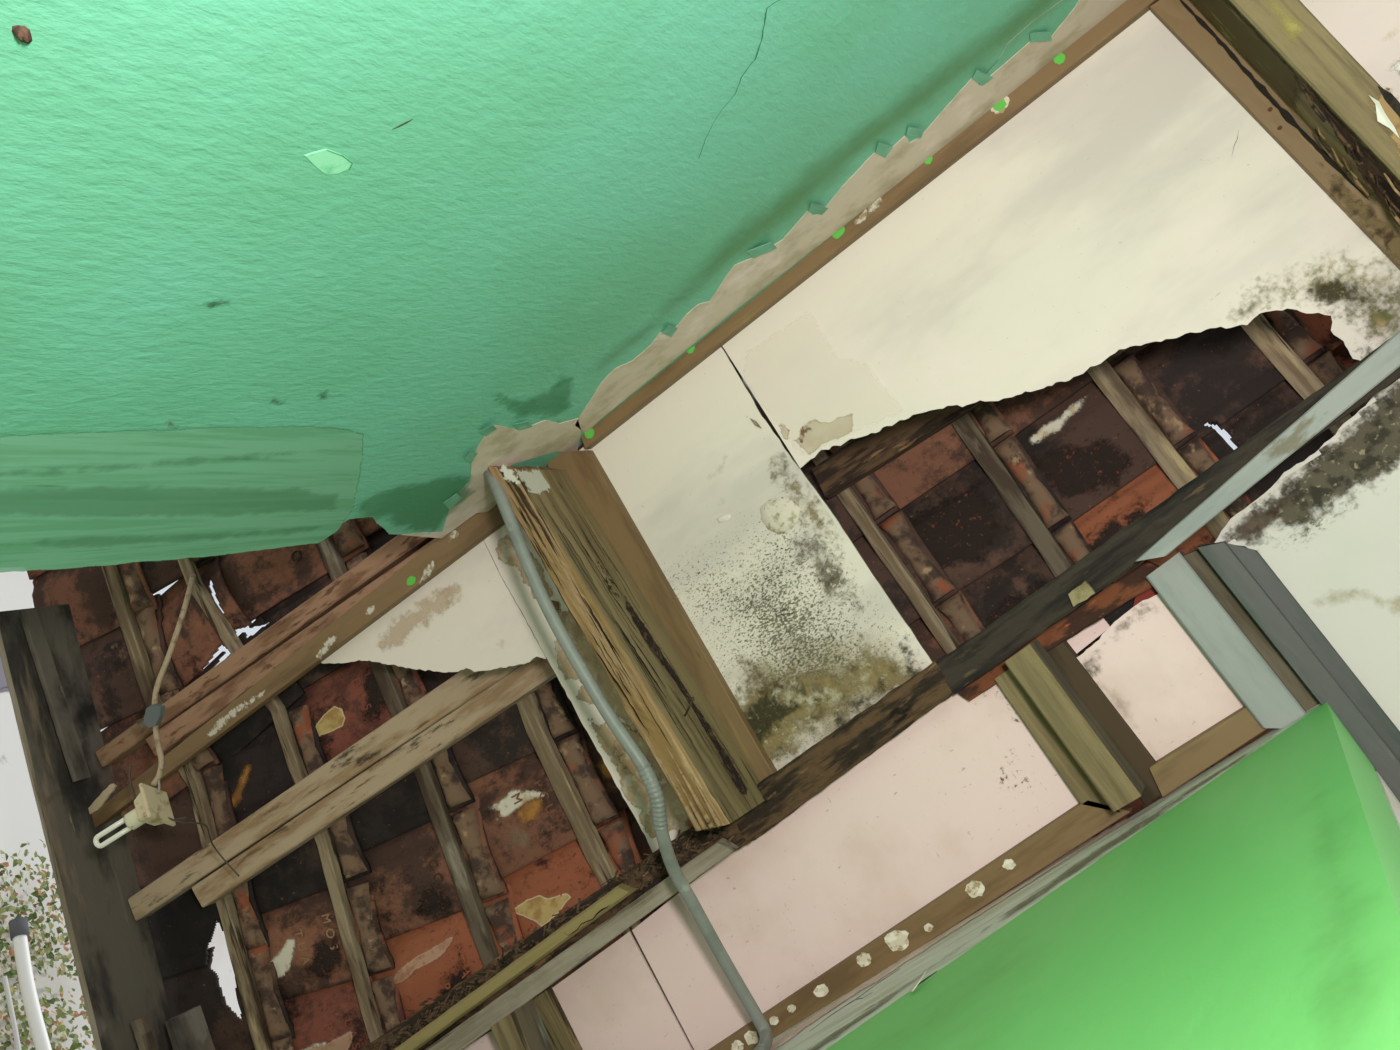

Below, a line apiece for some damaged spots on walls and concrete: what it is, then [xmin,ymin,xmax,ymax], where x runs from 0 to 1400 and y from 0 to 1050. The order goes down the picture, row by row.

crack [699,0,779,157]
peeling [305,149,353,175]
peeling [403,0,1127,538]
leakage [1309,265,1400,354]
crack [725,353,798,467]
leakage [1226,382,1400,544]
leakage [670,461,919,760]
peeling [770,818,1129,1050]